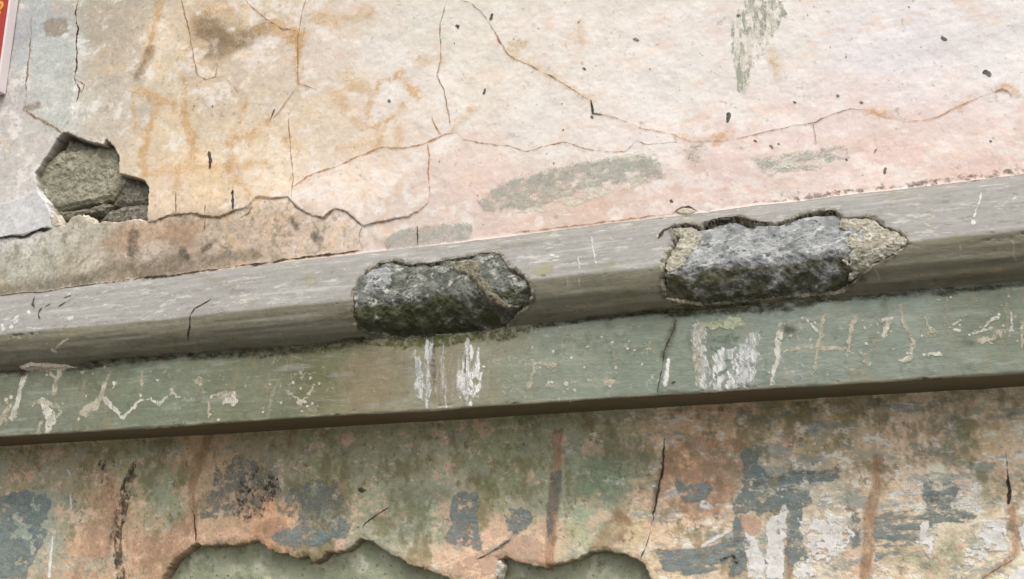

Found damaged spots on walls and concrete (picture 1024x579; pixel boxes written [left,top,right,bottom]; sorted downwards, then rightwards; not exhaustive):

flaking render [0,140,149,237]
crack [0,0,683,295]
crack [718,108,891,141]
crack [795,179,937,201]
crack [916,88,1012,121]
spalling [352,223,536,339]
spalling [657,199,910,393]
leakage [413,338,485,409]
crack [657,319,676,393]
flaking render [172,456,651,579]
crack [640,438,665,559]